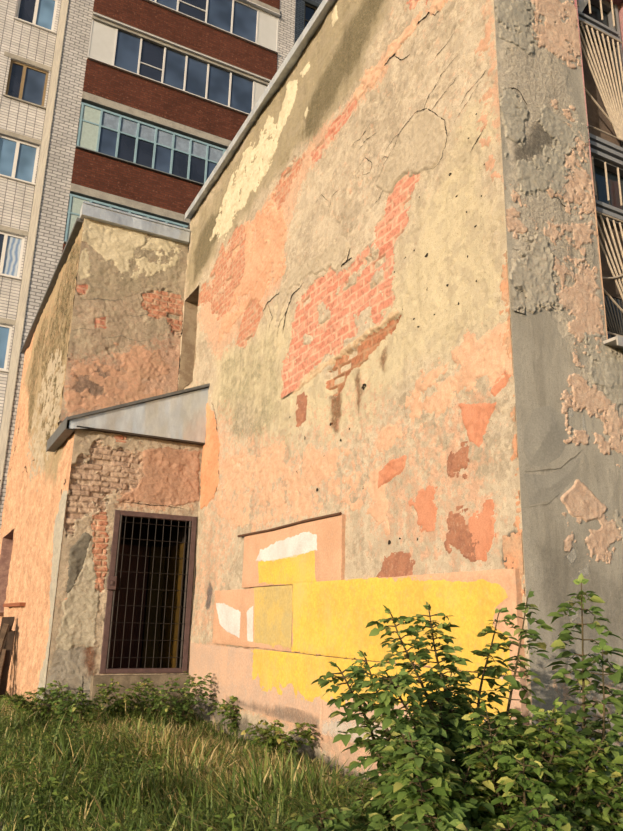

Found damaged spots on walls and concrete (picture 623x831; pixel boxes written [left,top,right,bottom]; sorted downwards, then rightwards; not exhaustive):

peeling [474,0,581,69]
peeling [198,0,448,349]
crack [357,33,488,202]
peeling [76,218,182,295]
flaking render [281,172,422,428]
peeling [405,84,623,479]
peeling [27,340,179,492]
flaking render [36,403,220,713]
peeling [284,423,416,578]
peeling [408,480,439,541]
peeling [444,490,525,596]
peeling [560,479,623,564]